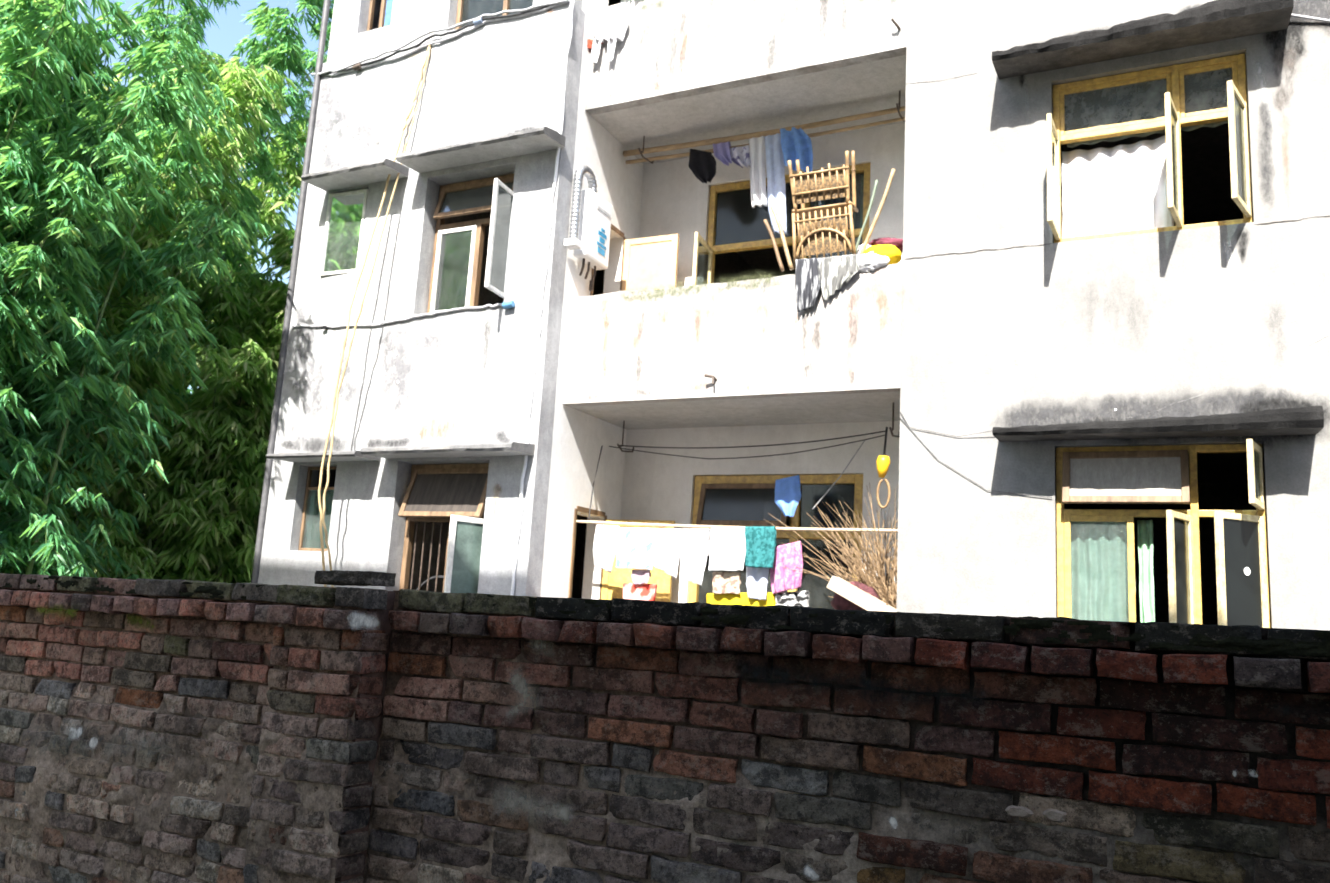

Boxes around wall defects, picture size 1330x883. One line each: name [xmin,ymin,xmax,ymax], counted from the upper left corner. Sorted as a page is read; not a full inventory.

leakage [1258,0,1330,195]
leakage [1227,232,1259,258]
leakage [293,310,323,412]
leakage [379,331,413,409]
leakage [368,439,408,447]
leakage [1005,390,1329,445]